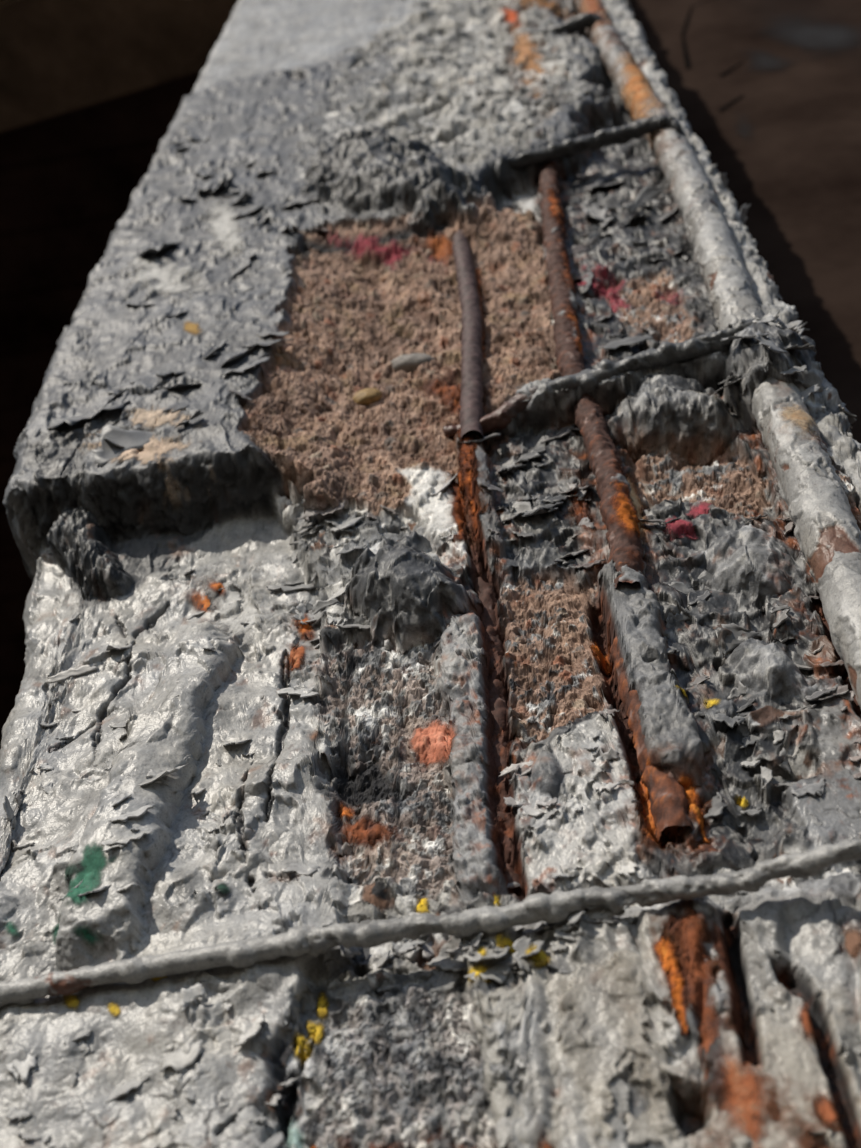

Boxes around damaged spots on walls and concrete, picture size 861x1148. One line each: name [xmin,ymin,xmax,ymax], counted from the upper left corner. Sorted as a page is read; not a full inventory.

spalling [285,68,307,82]
flaking render [315,0,593,173]
rust [621,53,658,121]
peeling [560,162,719,358]
peeling [0,122,670,950]
rust [421,370,482,547]
peeling [811,345,861,450]
peeling [622,432,861,850]
rust [411,721,454,763]
rust [636,775,709,849]
rust [654,911,746,1079]
rust [816,1095,839,1126]